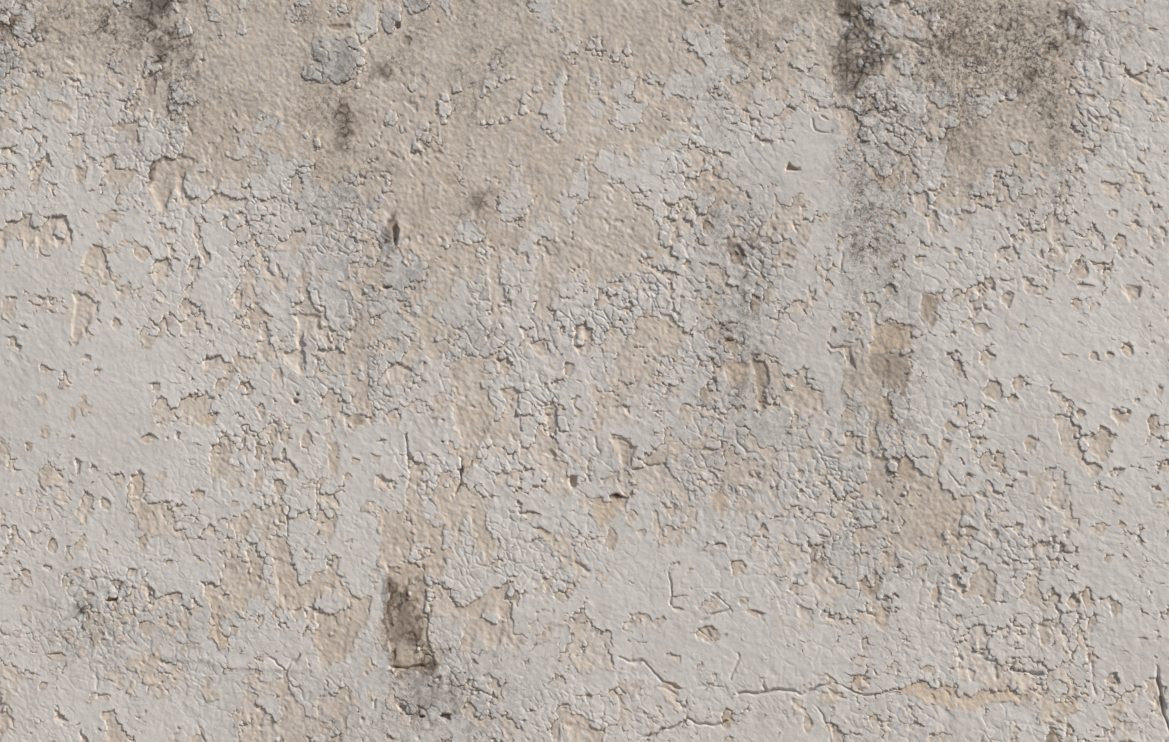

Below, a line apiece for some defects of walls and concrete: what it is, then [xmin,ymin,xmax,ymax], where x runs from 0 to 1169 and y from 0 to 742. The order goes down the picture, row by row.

water stain [139,0,176,61]
water stain [834,7,892,87]
peeling [0,0,1097,481]
peeling [400,263,997,633]
peeling [952,376,1027,500]
peeling [1050,390,1140,479]
peeling [138,422,374,668]
peeling [901,467,1127,742]
peeling [90,644,190,742]
peeling [239,663,365,742]
crack [619,592,902,742]
peeling [1101,672,1164,742]